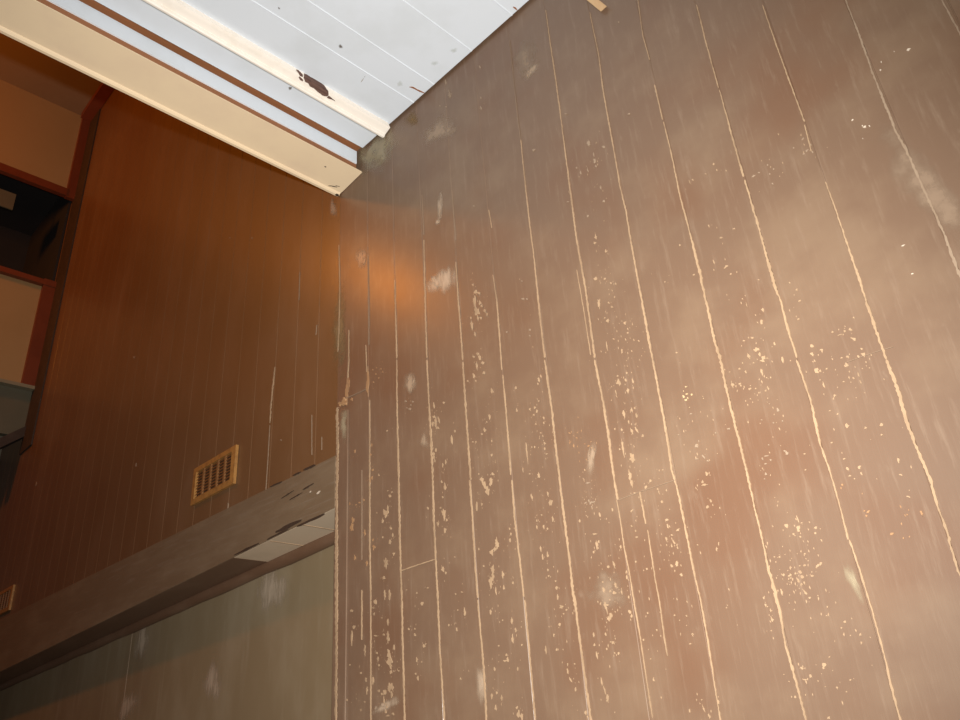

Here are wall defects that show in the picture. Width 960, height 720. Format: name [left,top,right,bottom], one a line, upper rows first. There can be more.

peeling [470,273,488,336]
peeling [731,337,791,480]
peeling [806,317,872,415]
peeling [349,469,395,579]
peeling [426,447,449,533]
peeling [472,414,498,511]
peeling [478,528,520,596]
peeling [540,546,573,653]
peeling [763,497,836,640]
peeling [346,590,399,716]
peeling [488,608,523,710]